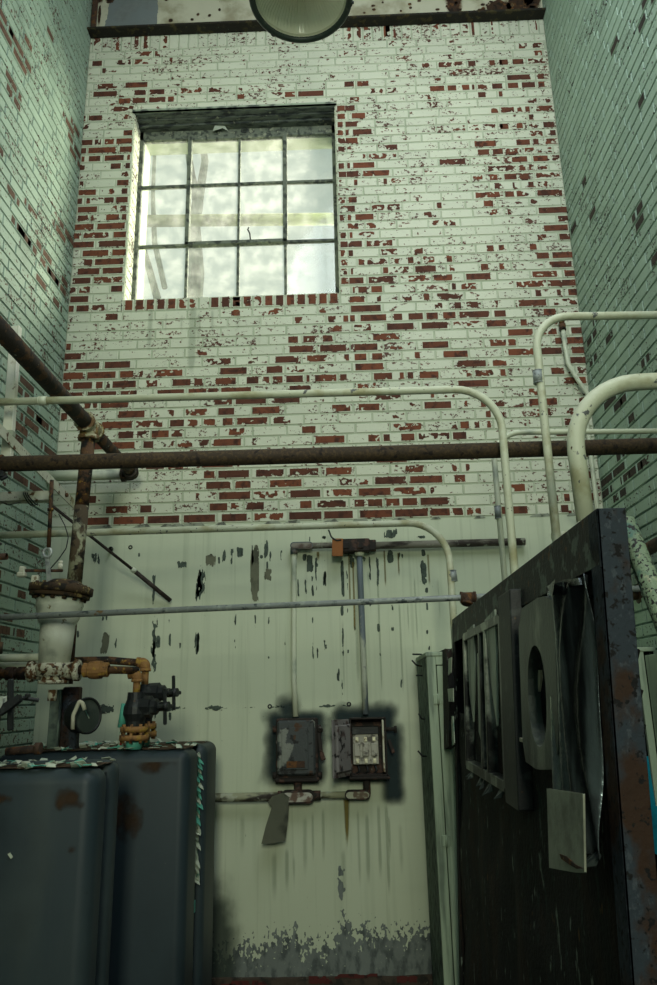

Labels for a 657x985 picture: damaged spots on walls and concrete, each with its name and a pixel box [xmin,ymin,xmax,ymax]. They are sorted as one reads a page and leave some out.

peeling [0,8,32,75]
peeling [105,0,173,65]
rust [435,0,541,12]
peeling [6,61,222,320]
peeling [63,43,613,449]
peeling [87,459,481,525]
peeling [502,506,528,514]
peeling [195,540,282,601]
peeling [297,554,326,596]
peeling [340,550,403,616]
peeling [418,535,428,610]
peeling [151,616,181,673]